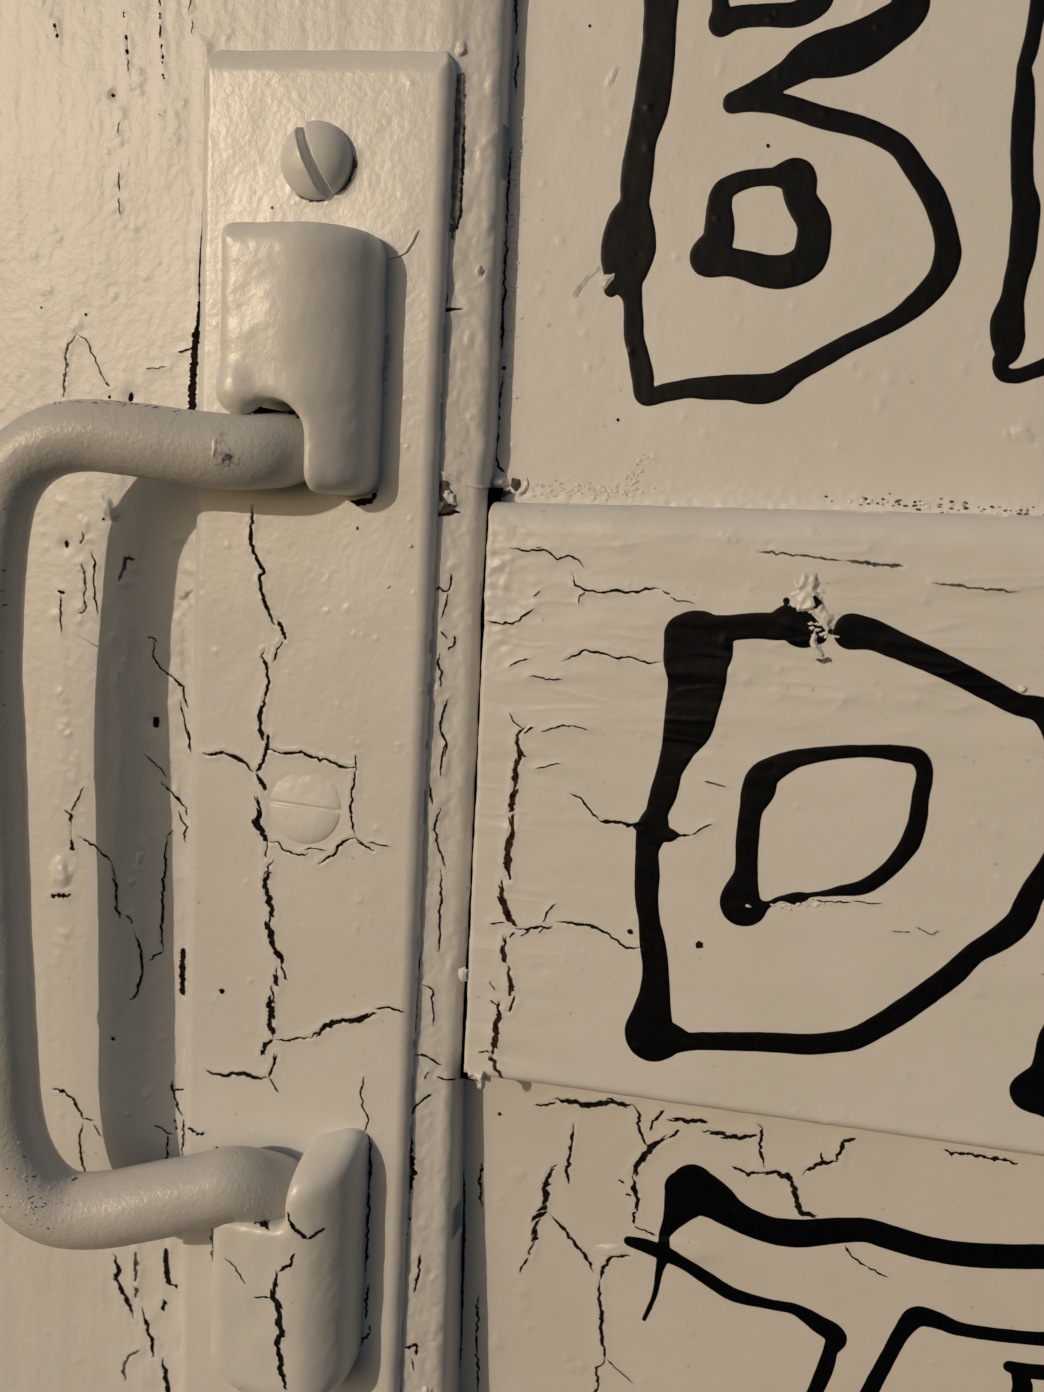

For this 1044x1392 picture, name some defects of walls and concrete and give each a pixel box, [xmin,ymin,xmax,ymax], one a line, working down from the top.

crack [57,532,98,633]
crack [509,649,656,681]
crack [510,547,694,604]
peeling [788,572,841,663]
crack [761,550,903,568]
crack [64,507,457,1115]
crack [478,713,639,1079]
crack [53,1088,101,1172]
crack [113,1252,170,1392]
crack [210,1212,324,1390]
crack [460,1163,484,1392]
crack [519,1098,855,1392]